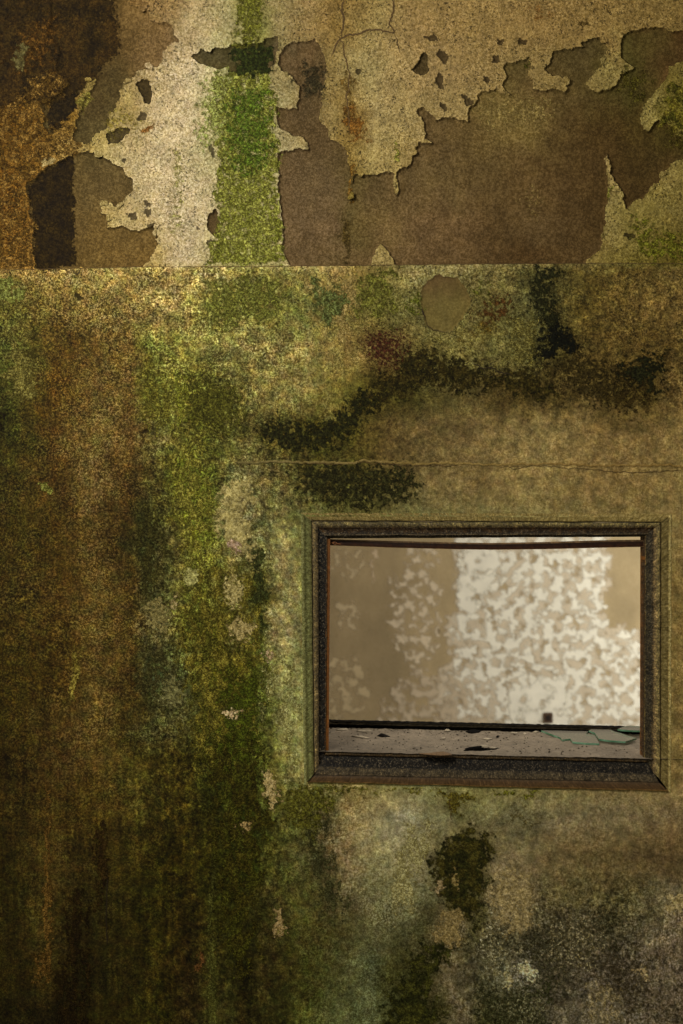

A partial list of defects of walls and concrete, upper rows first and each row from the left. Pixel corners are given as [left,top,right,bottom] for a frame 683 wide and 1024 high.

peeling [11,43,30,72]
peeling [25,0,179,269]
peeling [191,27,683,266]
water stain [253,260,672,514]
crack [236,459,683,473]
water stain [121,495,179,616]
water stain [241,523,271,632]
water stain [129,634,191,731]
water stain [213,661,271,785]
water stain [31,782,110,1024]
water stain [373,811,658,1024]